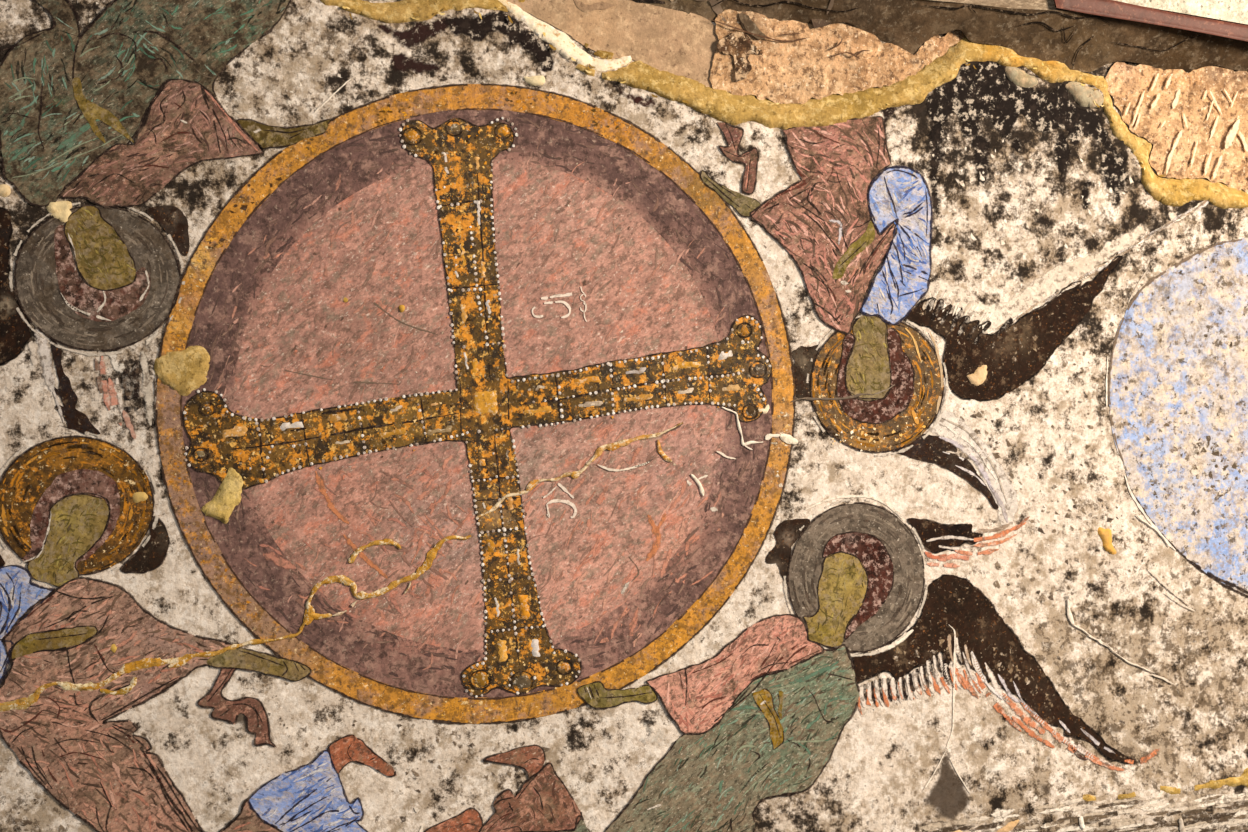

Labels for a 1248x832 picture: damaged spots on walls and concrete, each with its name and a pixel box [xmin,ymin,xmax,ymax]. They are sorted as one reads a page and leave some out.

peeling [338,67,391,106]
spalling [507,0,965,104]
water stain [926,61,1128,224]
spalling [1106,61,1248,194]
crack [0,407,798,712]